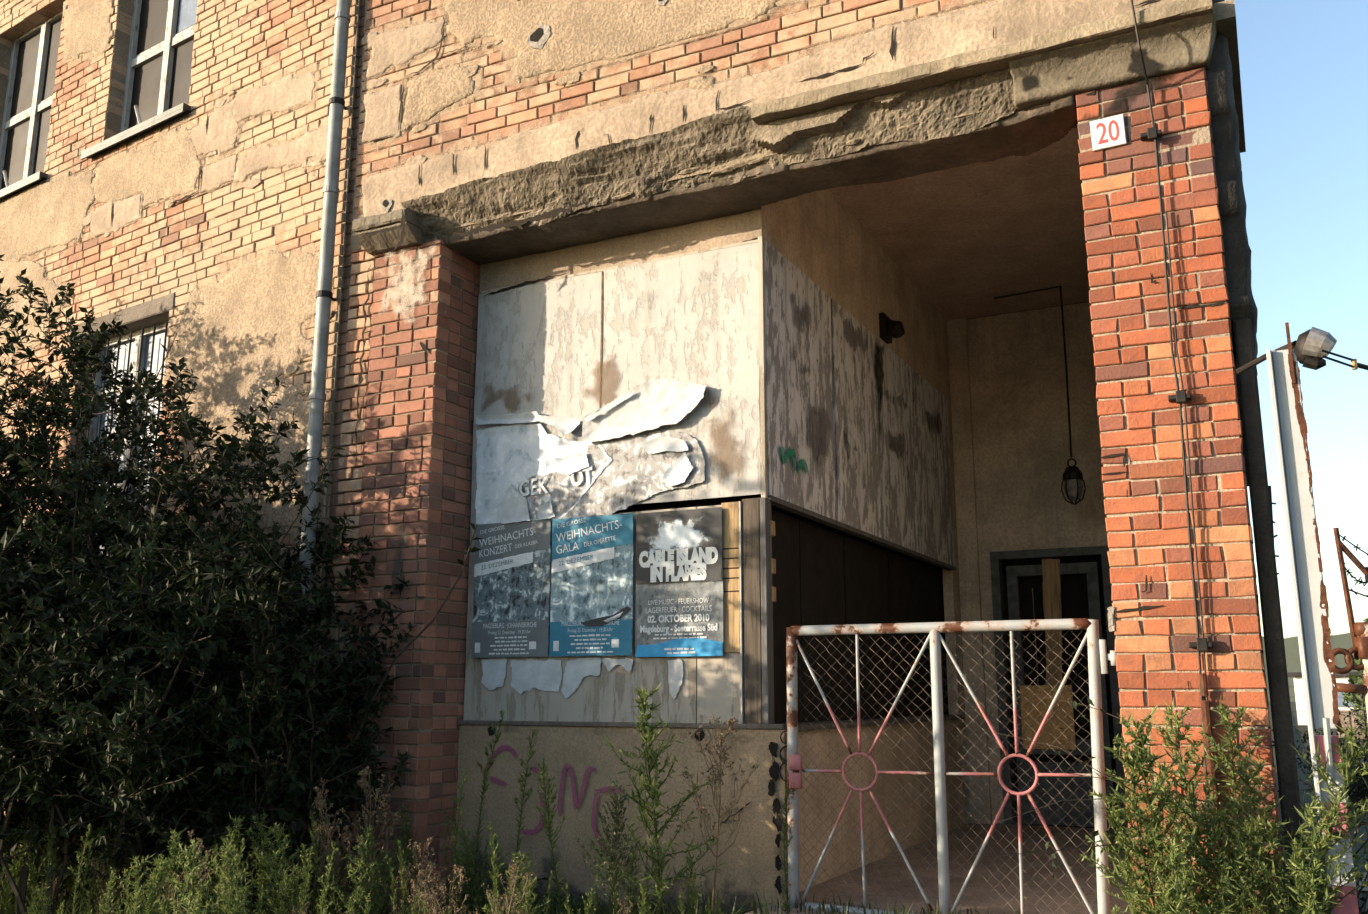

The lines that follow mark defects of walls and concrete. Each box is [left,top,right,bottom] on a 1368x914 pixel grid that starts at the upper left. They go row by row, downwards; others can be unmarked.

peeling [0,66,329,365]
spalling [360,0,1176,242]
damp [875,344,884,429]